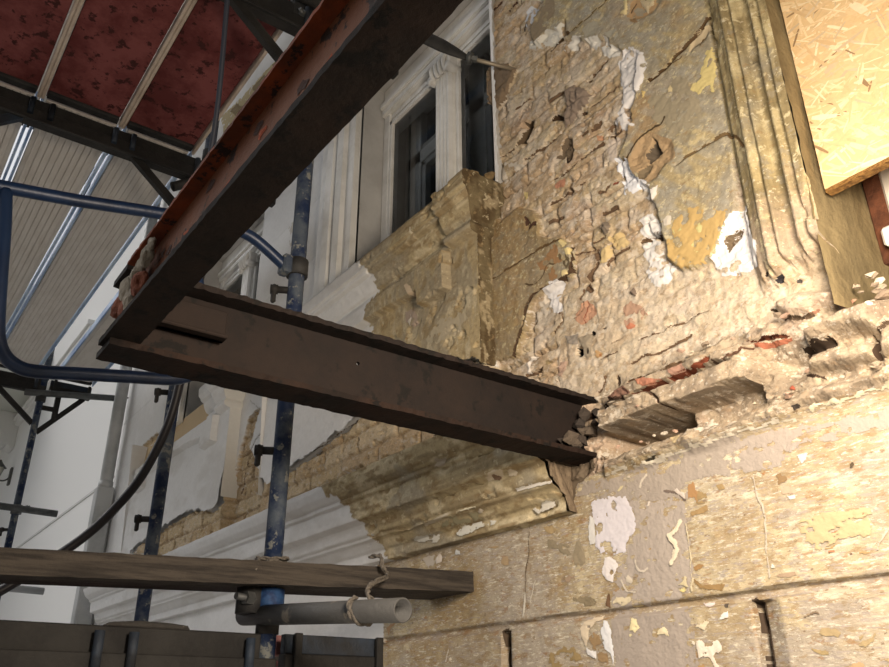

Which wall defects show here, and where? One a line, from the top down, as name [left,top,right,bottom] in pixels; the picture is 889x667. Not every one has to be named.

crack [551,0,607,52]
crack [648,17,712,82]
peeling [689,25,717,95]
spalling [628,132,675,183]
crack [677,132,744,165]
crack [492,60,665,377]
spalling [724,229,744,253]
crack [586,312,755,422]
peeling [809,365,889,412]
peeling [515,480,552,492]
peeling [457,520,496,536]
peeling [577,405,889,667]